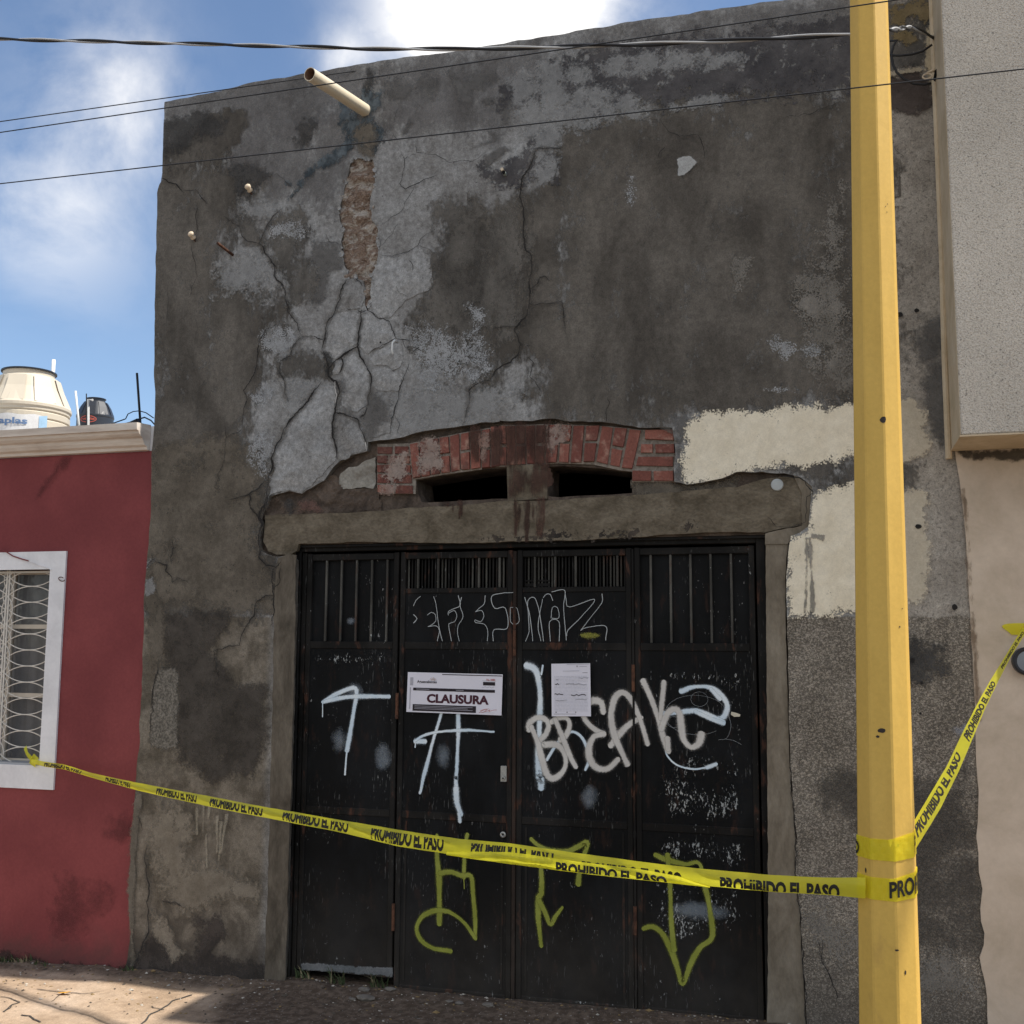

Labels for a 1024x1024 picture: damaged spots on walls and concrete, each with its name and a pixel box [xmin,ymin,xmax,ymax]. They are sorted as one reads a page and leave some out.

crack [162,178,206,323]
spalling [337,156,380,309]
crack [381,109,484,296]
crack [464,141,566,419]
water stain [893,162,904,208]
crack [214,174,422,677]
water stain [143,3,854,785]
corrosion [469,419,554,542]
peeling [546,420,570,456]
peeling [677,401,854,484]
peeling [786,481,855,619]
water stain [903,460,927,491]